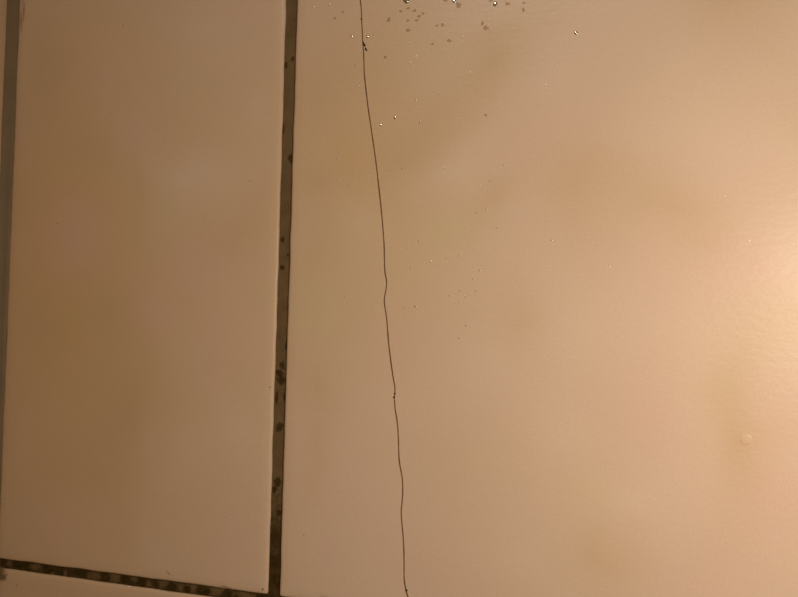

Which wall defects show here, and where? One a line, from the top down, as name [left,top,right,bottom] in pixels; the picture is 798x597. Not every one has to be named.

damp [0,511,283,597]
crack [360,0,409,597]